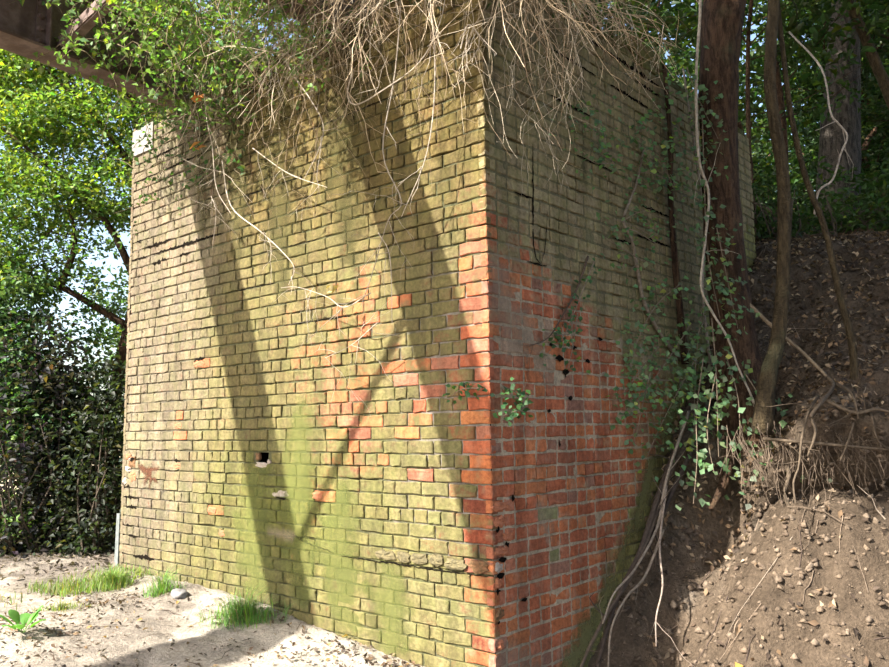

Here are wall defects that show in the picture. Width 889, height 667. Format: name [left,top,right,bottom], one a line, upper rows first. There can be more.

crack [515,156,547,266]
crack [131,233,221,266]
spalling [255,452,272,468]